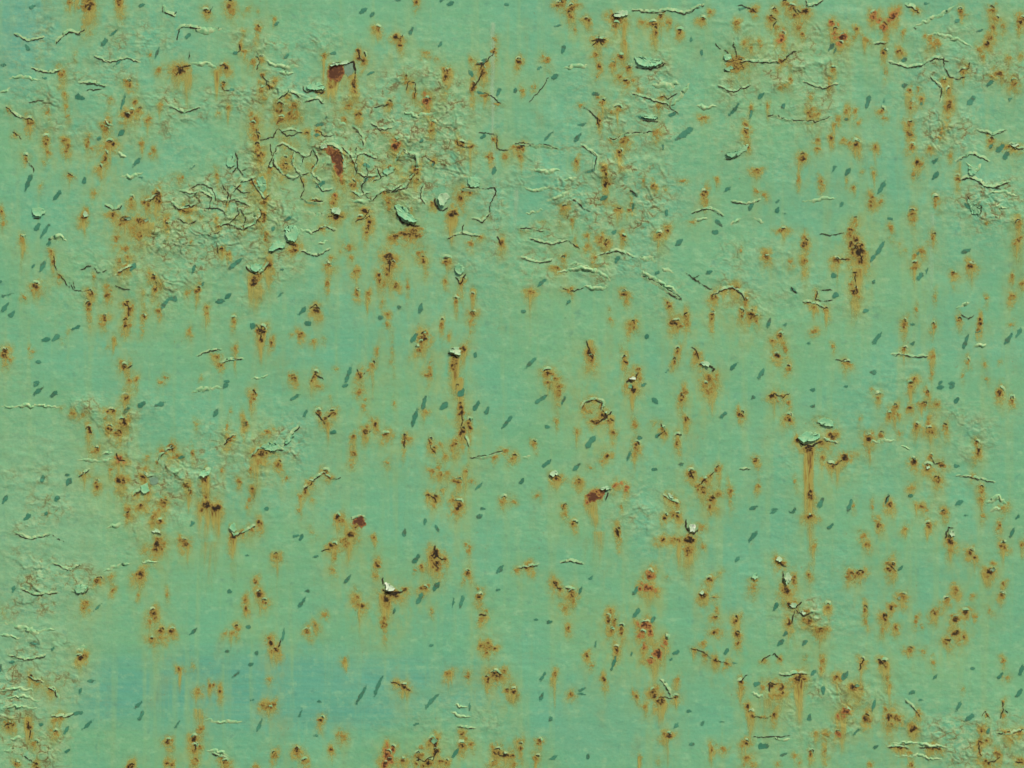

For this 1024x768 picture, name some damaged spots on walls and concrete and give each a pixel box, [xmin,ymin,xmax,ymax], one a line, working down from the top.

peeling [303,60,374,104]
peeling [634,56,665,70]
crack [873,41,949,103]
crack [177,121,427,236]
crack [955,128,1010,189]
crack [300,225,337,257]
peeling [385,193,424,248]
crack [519,221,712,301]
rust [775,216,870,311]
peeling [794,418,840,543]
crack [14,531,81,596]
peeling [377,543,449,640]